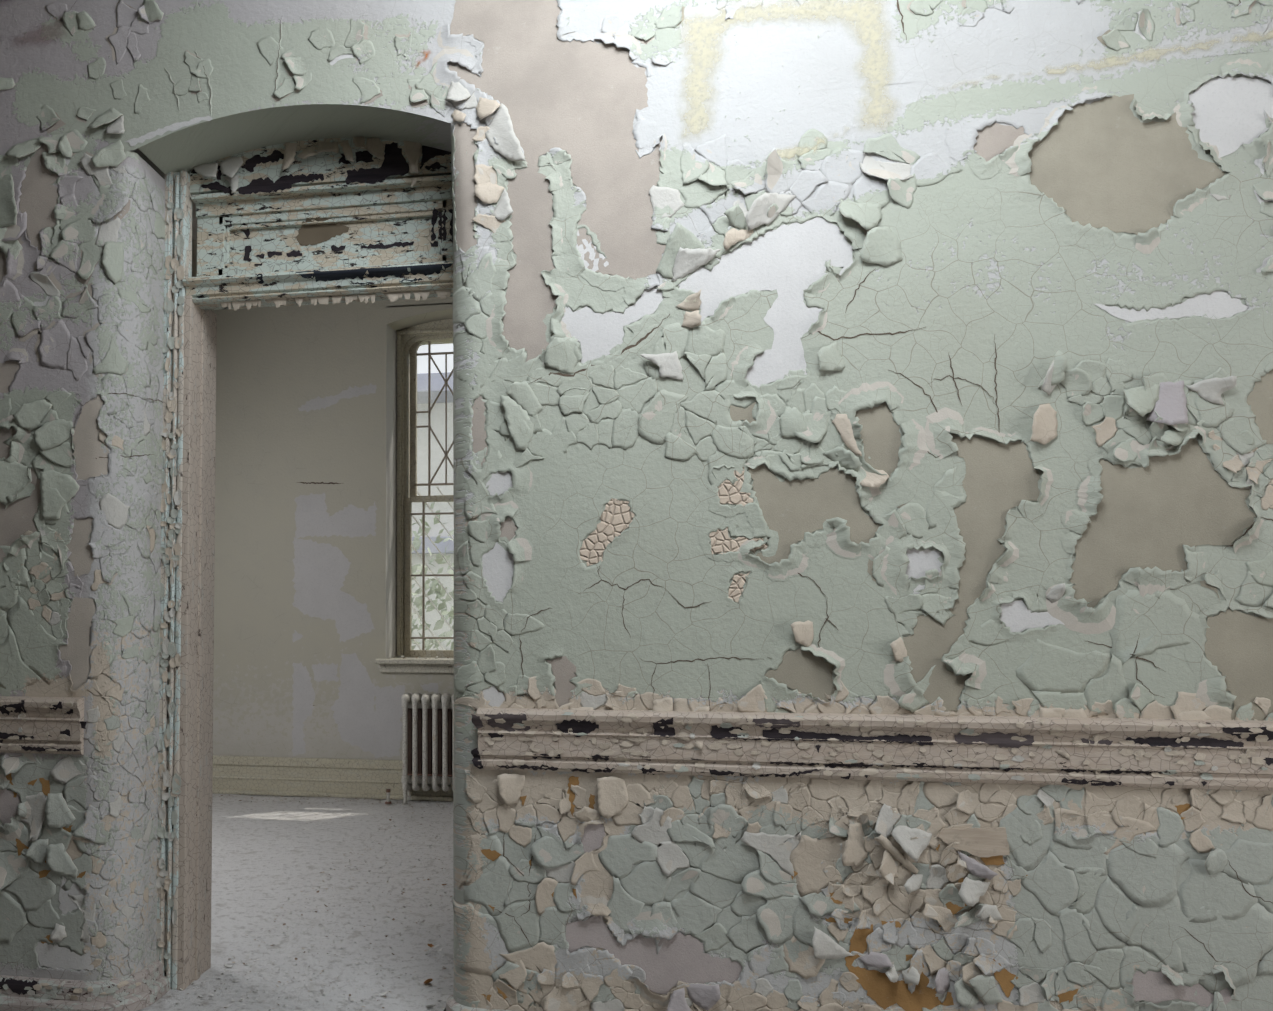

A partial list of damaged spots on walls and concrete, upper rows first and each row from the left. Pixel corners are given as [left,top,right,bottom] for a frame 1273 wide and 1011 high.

peeling [173,50,213,103]
peeling [257,36,312,102]
peeling [308,18,383,105]
peeling [193,142,324,196]
peeling [225,216,350,284]
peeling [220,293,376,311]
peeling [291,261,453,287]
flaking render [338,0,1273,1011]
peeling [292,492,377,642]
crack [519,608,552,673]
crack [579,552,755,706]
crack [798,573,839,648]